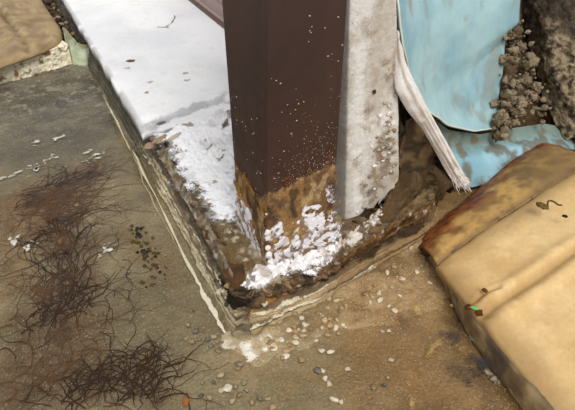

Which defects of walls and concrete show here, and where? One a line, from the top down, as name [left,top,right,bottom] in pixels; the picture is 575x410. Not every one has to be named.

leakage [358,119,396,201]
leakage [105,96,376,362]
rust [233,144,341,262]
leakage [340,215,428,270]
spalling [213,265,268,313]